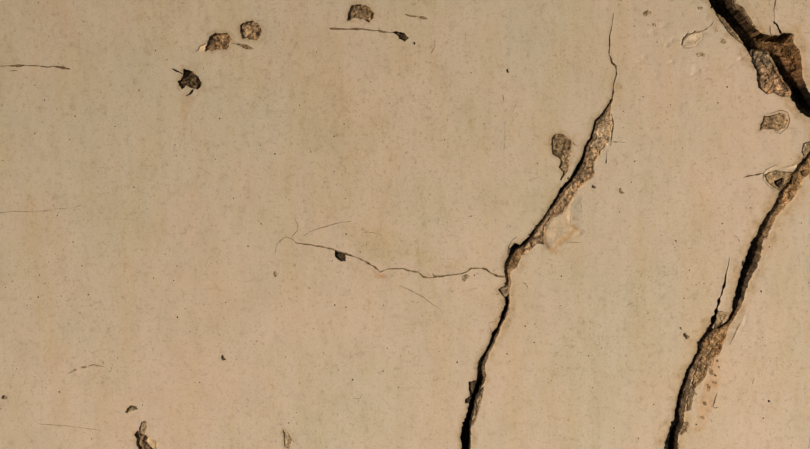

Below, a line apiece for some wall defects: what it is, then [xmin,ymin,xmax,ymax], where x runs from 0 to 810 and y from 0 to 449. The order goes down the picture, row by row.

spalling [341,0,381,26]
spalling [197,14,267,57]
spalling [172,63,210,96]
spalling [753,108,794,137]
spalling [545,126,579,186]
crack [275,14,617,449]
crack [652,0,810,449]
spalling [128,421,157,449]